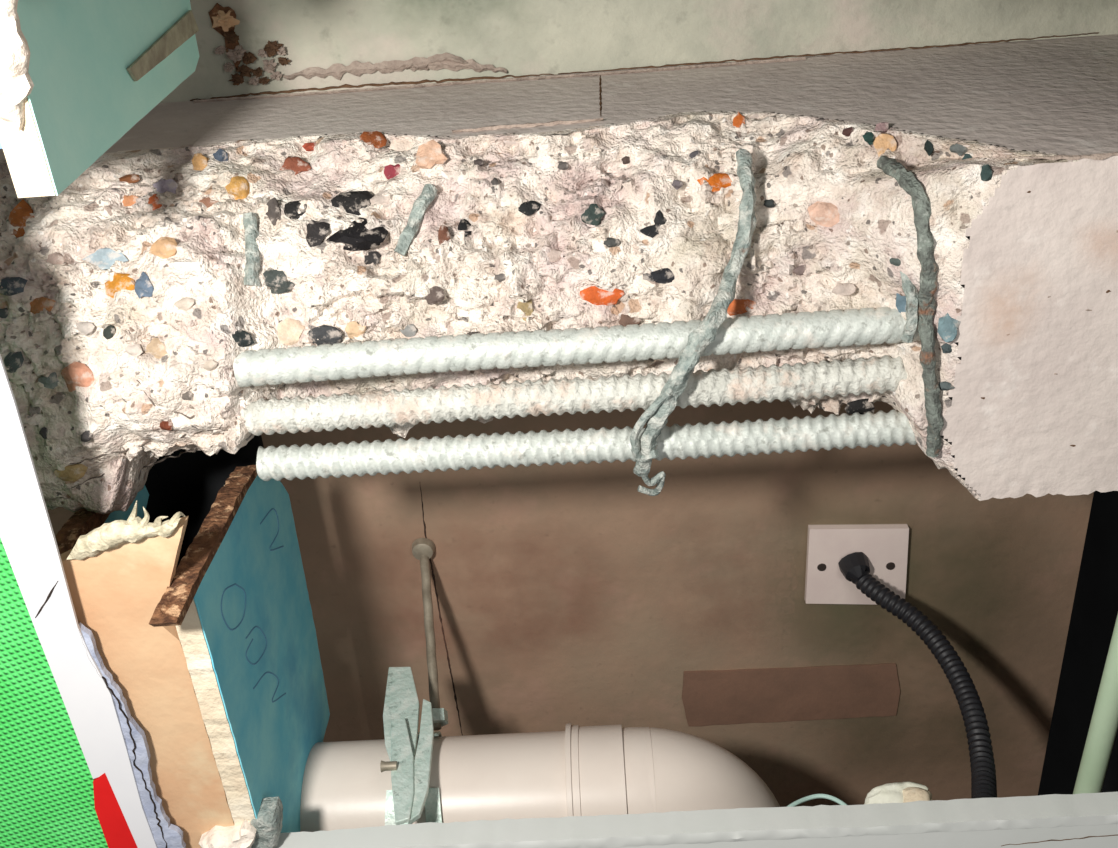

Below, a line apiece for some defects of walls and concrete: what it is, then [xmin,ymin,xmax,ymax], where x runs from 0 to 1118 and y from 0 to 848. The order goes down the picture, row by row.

spalling [208,3,290,86]
spalling [0,111,1118,514]